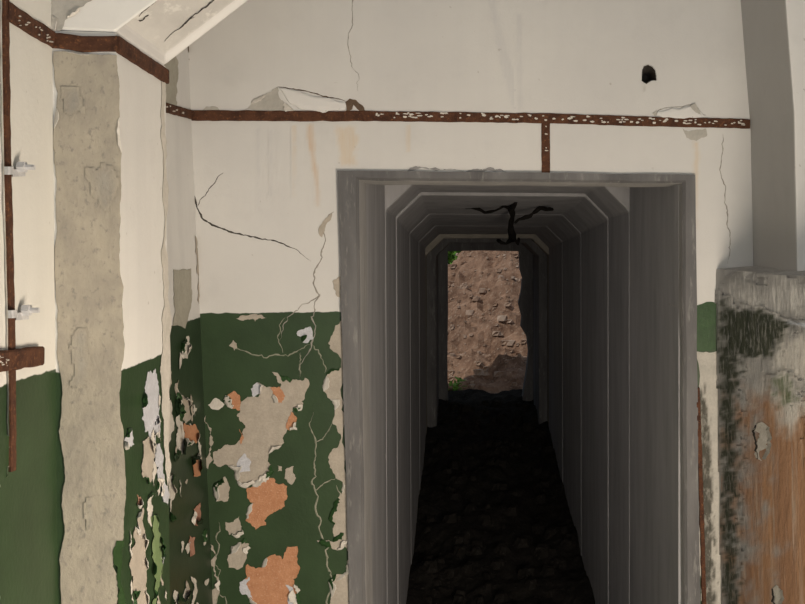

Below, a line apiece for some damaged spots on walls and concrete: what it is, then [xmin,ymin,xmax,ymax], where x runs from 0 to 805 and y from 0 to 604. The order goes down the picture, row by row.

spalling [51,0,92,31]
crack [164,0,214,42]
crack [348,0,359,91]
rust [166,103,750,173]
rust [691,140,704,232]
rust [0,0,169,472]
crack [195,174,333,377]
flaking render [53,51,310,604]
peeling [297,327,313,343]
peeling [317,321,349,604]